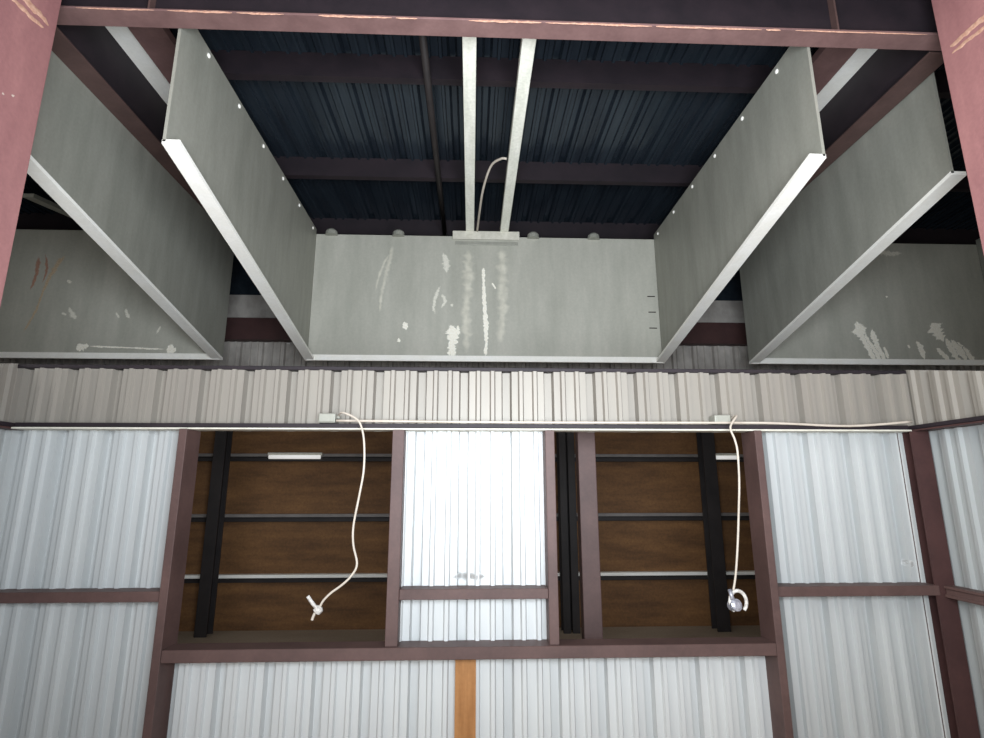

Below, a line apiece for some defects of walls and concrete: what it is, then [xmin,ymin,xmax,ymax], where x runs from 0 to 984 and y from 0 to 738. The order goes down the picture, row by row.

peeling [12,0,49,28]
peeling [469,20,781,31]
peeling [950,15,984,54]